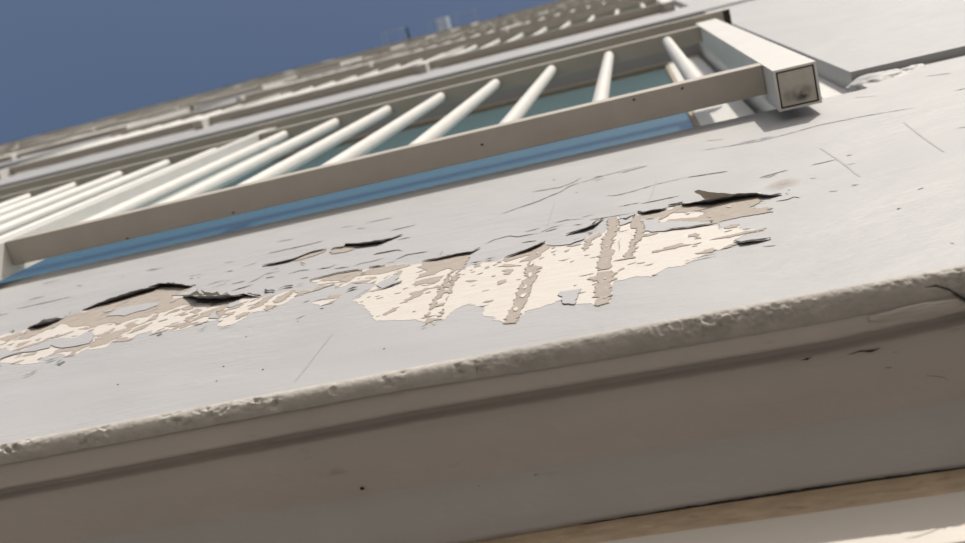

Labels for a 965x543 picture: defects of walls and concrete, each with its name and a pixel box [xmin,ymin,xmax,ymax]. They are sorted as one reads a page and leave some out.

peeling [0,190,782,376]
spalling [0,265,965,465]
crack [848,348,898,368]
crack [868,284,965,323]